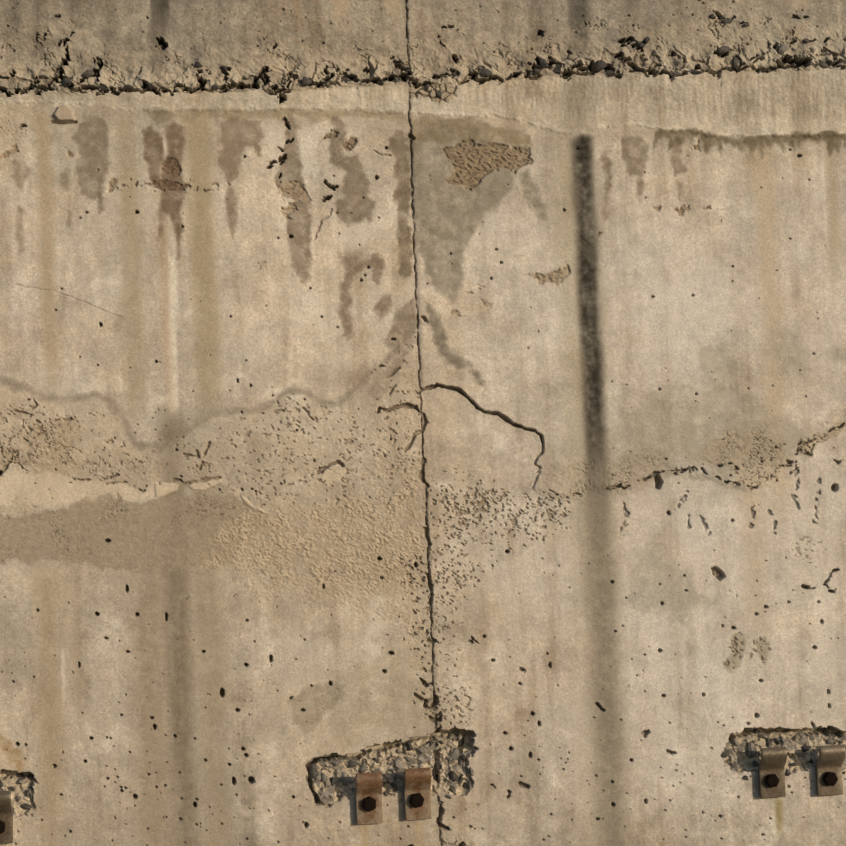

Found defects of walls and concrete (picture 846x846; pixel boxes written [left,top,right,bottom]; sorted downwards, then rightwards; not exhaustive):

water stain [146,0,171,56]
spalling [0,8,846,190]
crack [517,65,846,81]
water stain [0,110,488,499]
crack [0,0,585,733]
water stain [386,78,846,846]
crack [604,404,846,492]
spalling [0,769,38,818]
water stain [117,561,240,846]
peeling [0,421,593,808]
crack [435,794,451,846]
spalling [720,726,846,780]